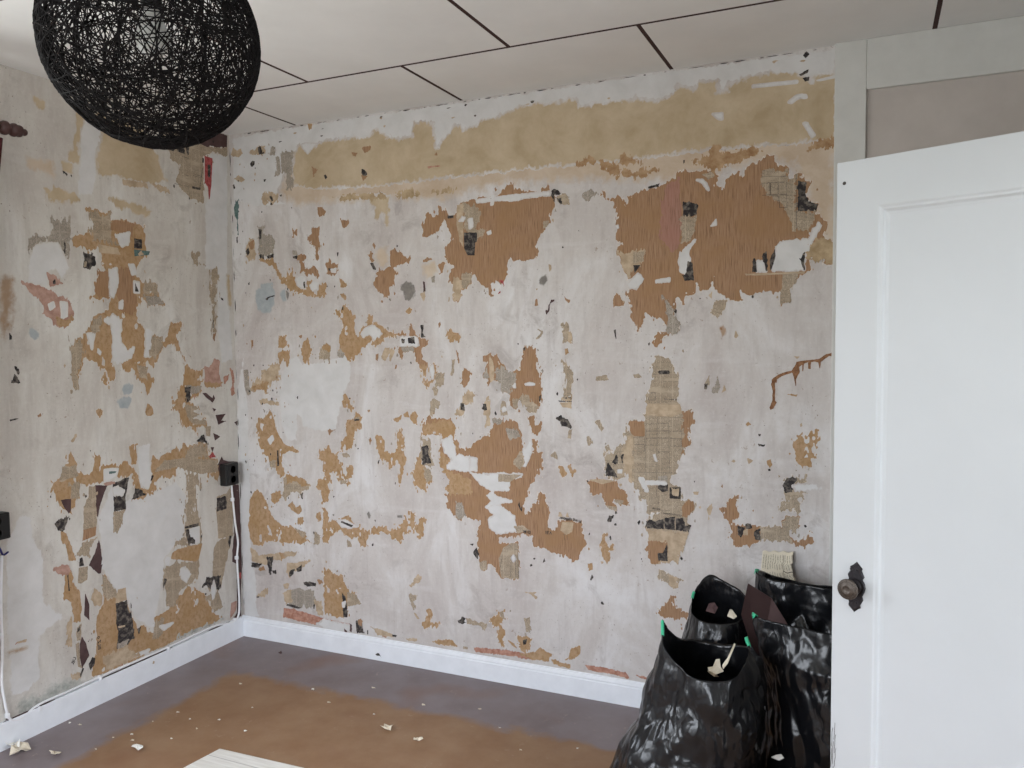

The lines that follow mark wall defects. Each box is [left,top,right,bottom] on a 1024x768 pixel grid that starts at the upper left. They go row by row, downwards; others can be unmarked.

peeling [367,182,557,303]
peeling [597,154,833,357]
peeling [21,206,186,416]
peeling [47,434,219,520]
peeling [233,206,615,582]
peeling [586,478,635,514]
peeling [641,481,815,565]
peeling [789,423,821,471]
peeling [71,574,222,681]
peeling [314,560,361,619]